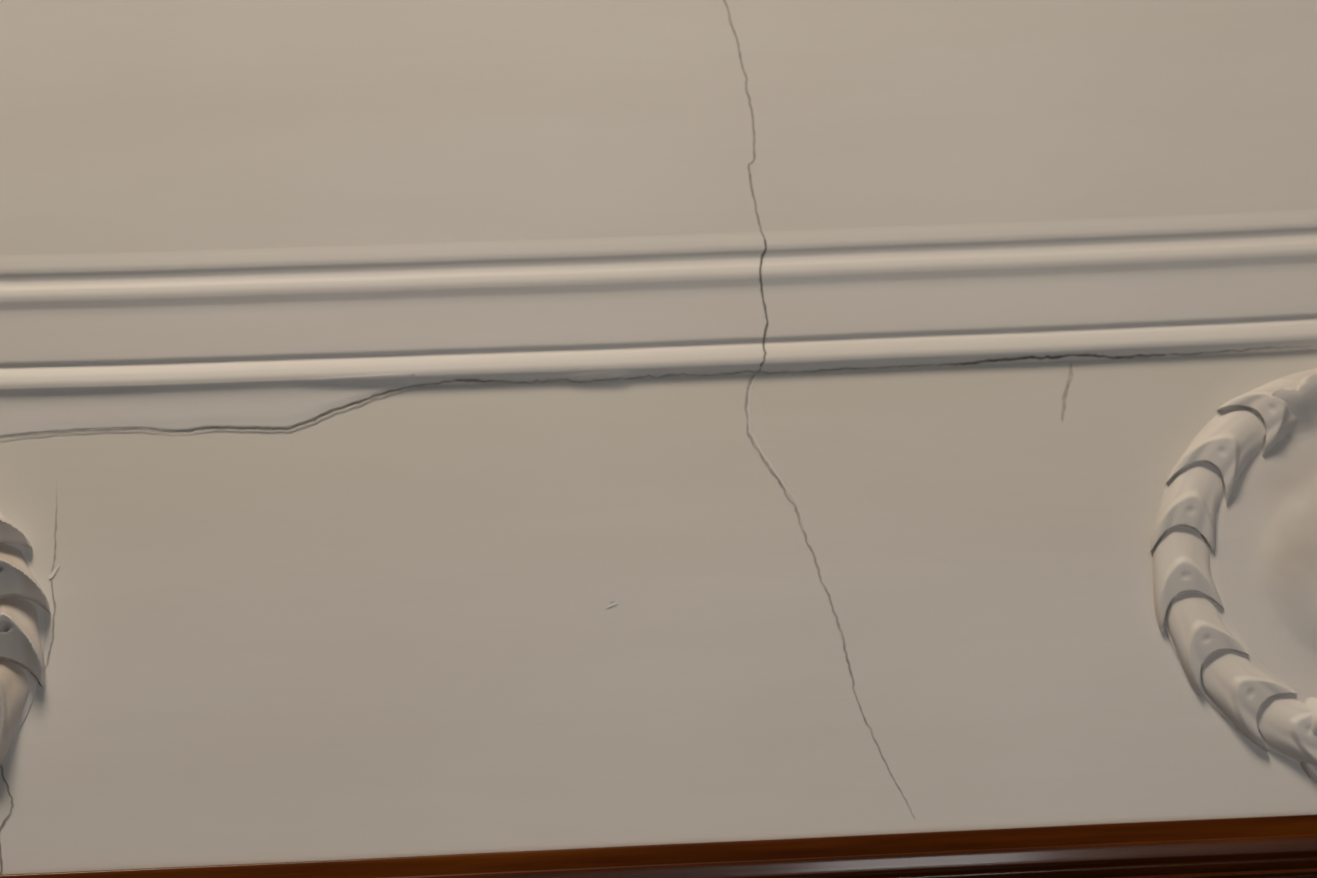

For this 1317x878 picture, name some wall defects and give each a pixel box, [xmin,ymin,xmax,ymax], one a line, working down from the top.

crack [0,370,758,438]
crack [723,0,1166,818]
crack [1167,346,1291,356]
crack [37,483,60,686]
crack [0,765,14,874]